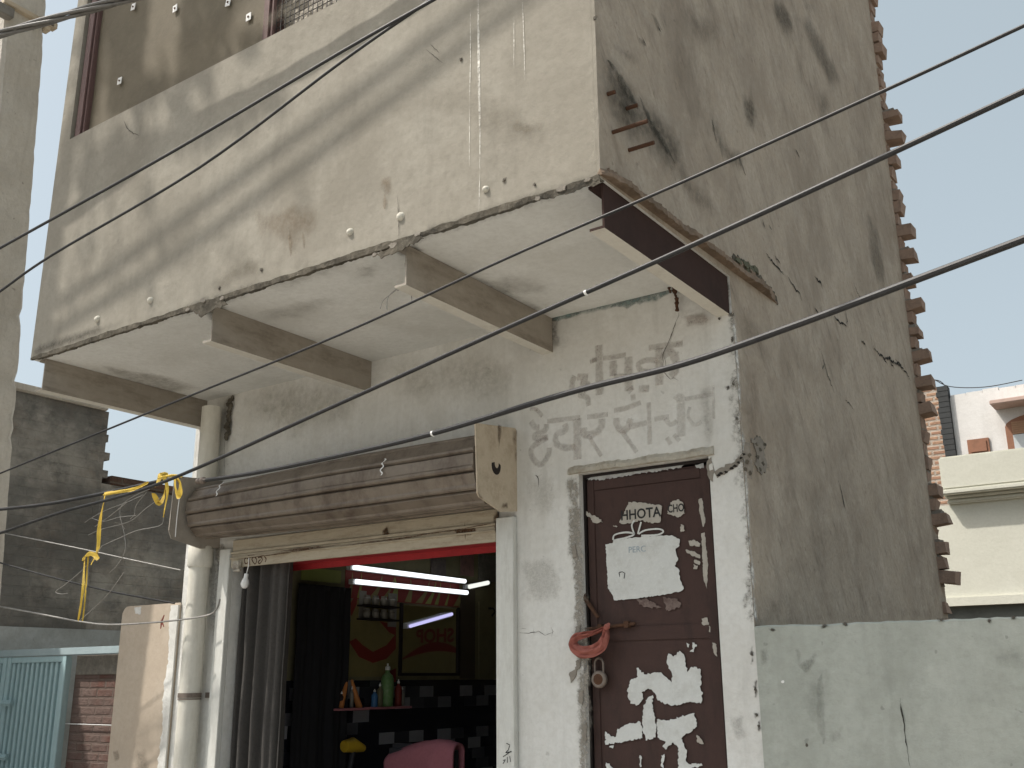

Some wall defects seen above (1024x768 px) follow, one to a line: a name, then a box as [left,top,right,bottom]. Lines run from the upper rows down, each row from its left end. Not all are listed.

spalling [533,168,618,201]
spalling [372,232,424,259]
spalling [185,287,228,318]
crack [766,253,911,381]
peeling [706,411,769,482]
crack [900,698,909,761]